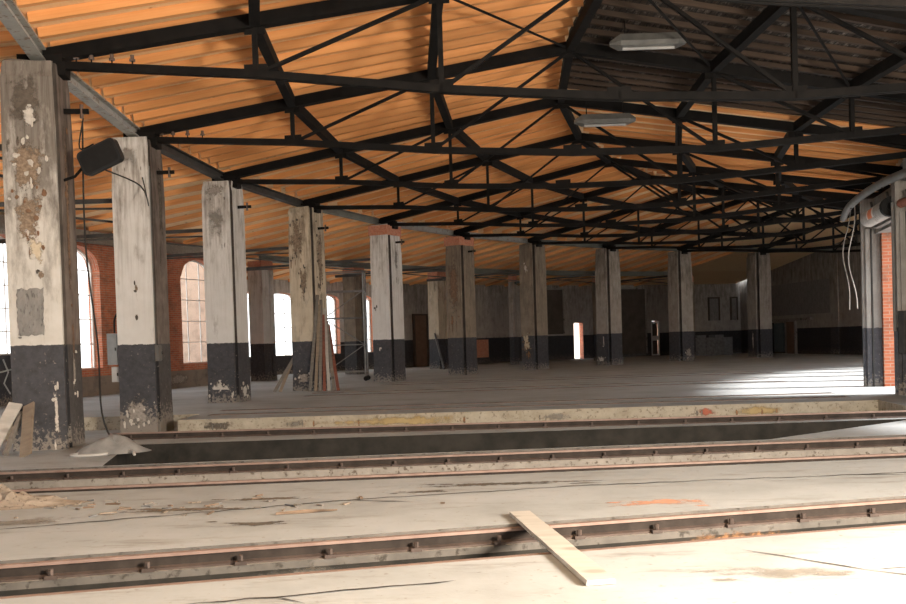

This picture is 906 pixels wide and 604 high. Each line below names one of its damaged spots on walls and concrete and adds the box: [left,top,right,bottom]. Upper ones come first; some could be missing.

flaking render [8,104,50,339]
spalling [209,380,249,398]
peeling [123,399,155,431]